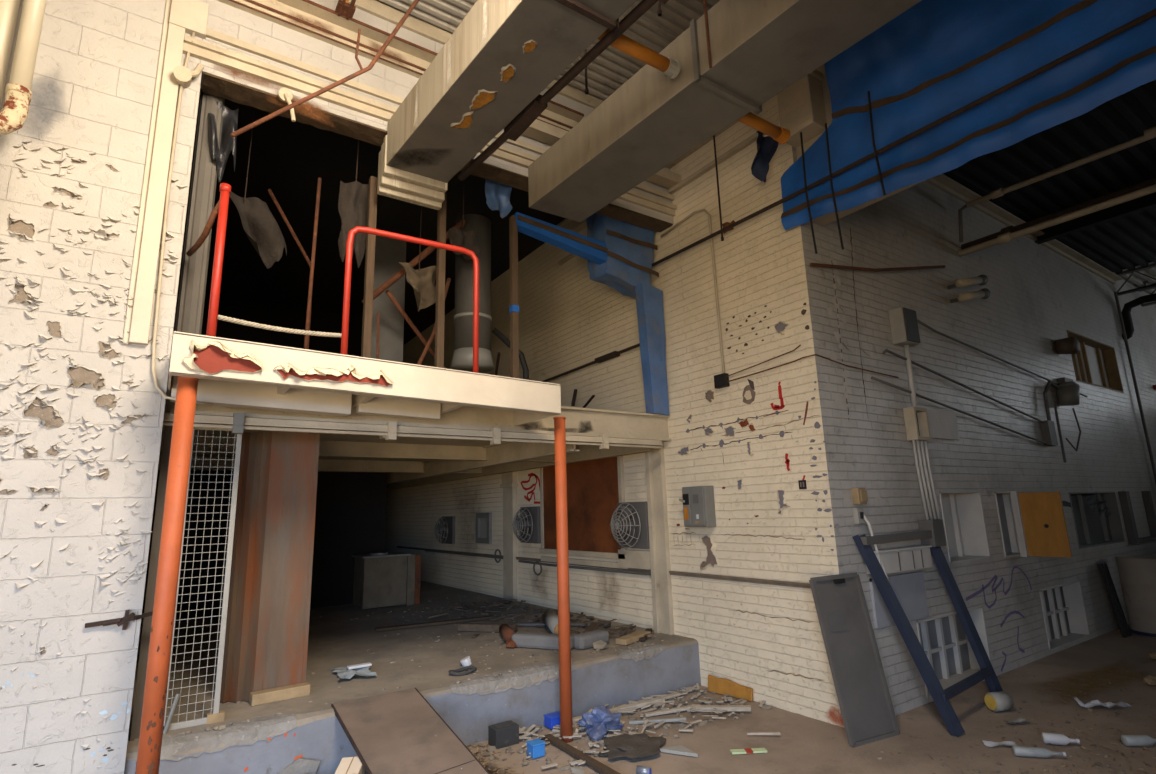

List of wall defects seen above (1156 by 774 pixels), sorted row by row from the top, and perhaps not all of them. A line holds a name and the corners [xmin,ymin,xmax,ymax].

peeling [11,141,96,215]
peeling [0,205,170,531]
peeling [182,339,393,386]
peeling [57,501,152,602]
peeling [81,738,121,768]